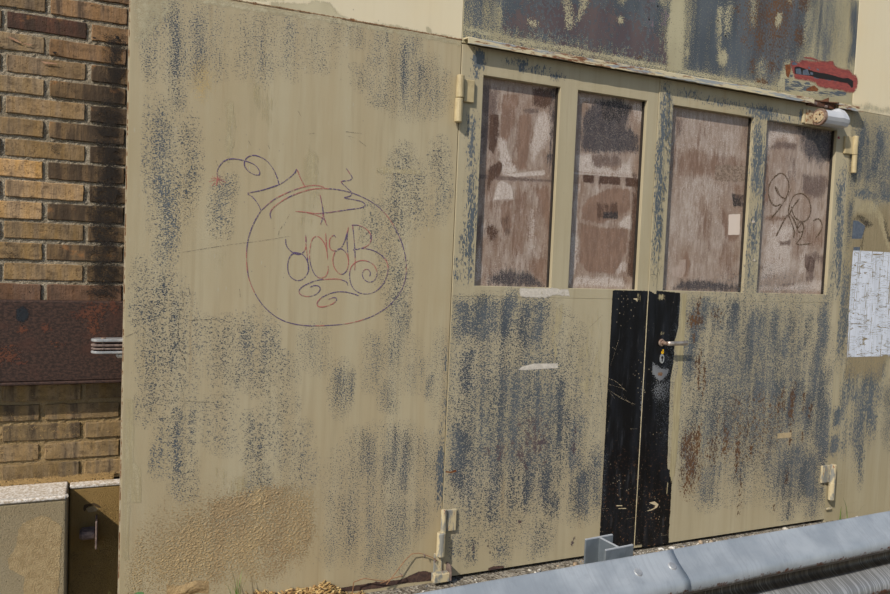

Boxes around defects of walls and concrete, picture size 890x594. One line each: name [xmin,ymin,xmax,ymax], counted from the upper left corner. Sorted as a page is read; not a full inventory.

peeling [126,0,607,580]
peeling [463,0,890,523]
rust [686,292,722,399]
rust [678,380,813,515]